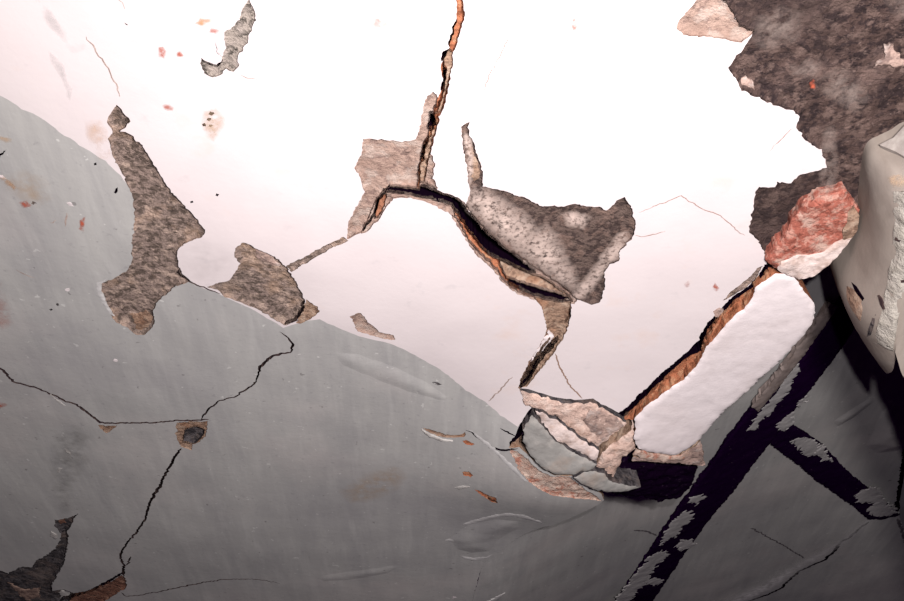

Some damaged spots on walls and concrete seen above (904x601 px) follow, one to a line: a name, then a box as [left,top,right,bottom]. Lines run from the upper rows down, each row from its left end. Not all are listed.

spalling [200,0,256,77]
spalling [96,105,320,335]
spalling [347,92,438,239]
crack [361,0,582,401]
spalling [461,122,636,305]
spalling [676,0,904,254]
crack [619,195,773,420]
crack [0,333,295,433]
crack [466,408,532,451]
peeling [746,363,810,431]
spalling [0,513,127,601]
crack [119,449,280,597]